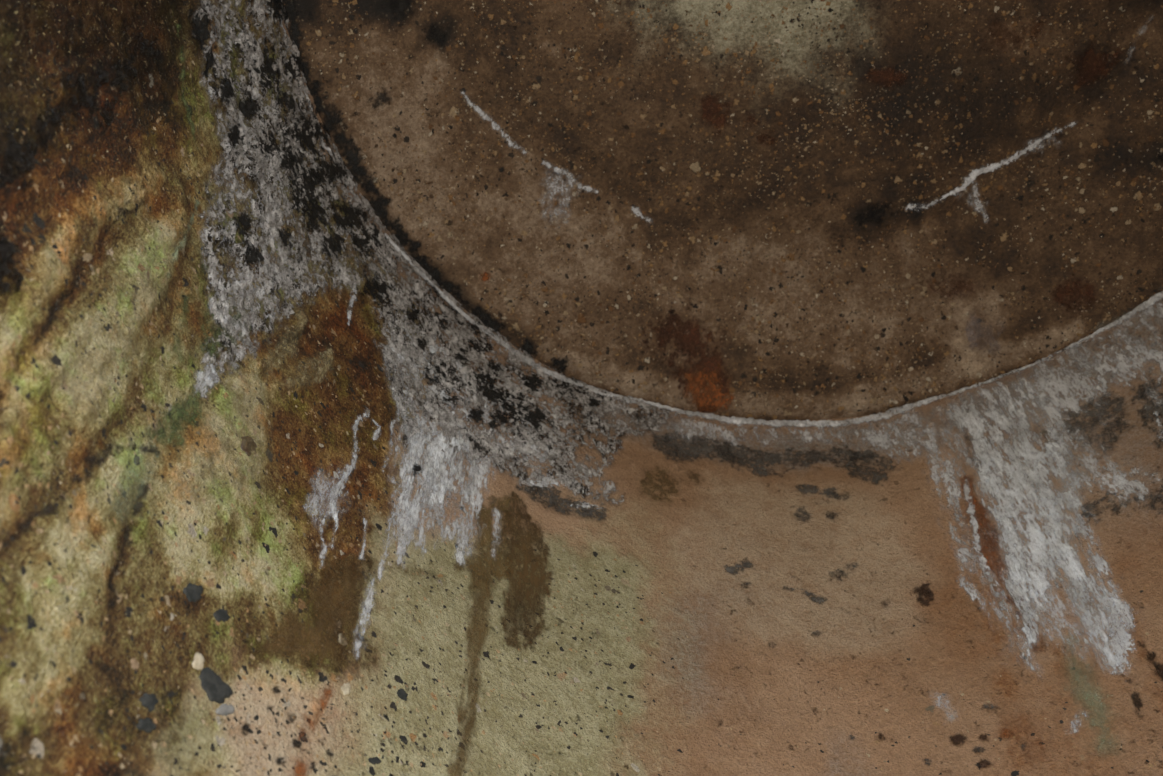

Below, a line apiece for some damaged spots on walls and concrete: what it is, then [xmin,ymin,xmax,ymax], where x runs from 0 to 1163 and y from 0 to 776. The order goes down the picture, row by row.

crack [461,92,598,215]
crack [906,123,1076,217]
water stain [192,0,1163,673]
corrosion [643,308,734,413]
water stain [449,571,491,776]